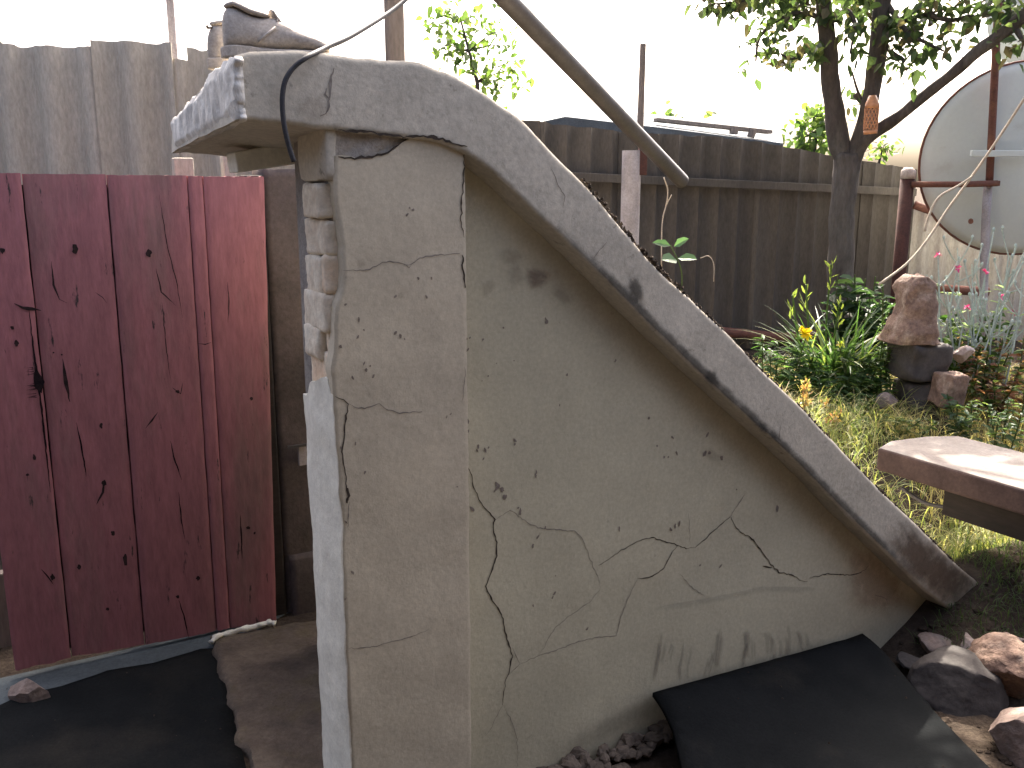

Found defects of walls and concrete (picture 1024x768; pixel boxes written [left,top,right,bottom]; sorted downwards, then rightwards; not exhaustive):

crack [321,69,467,288]
crack [335,396,422,526]
crack [468,468,866,766]